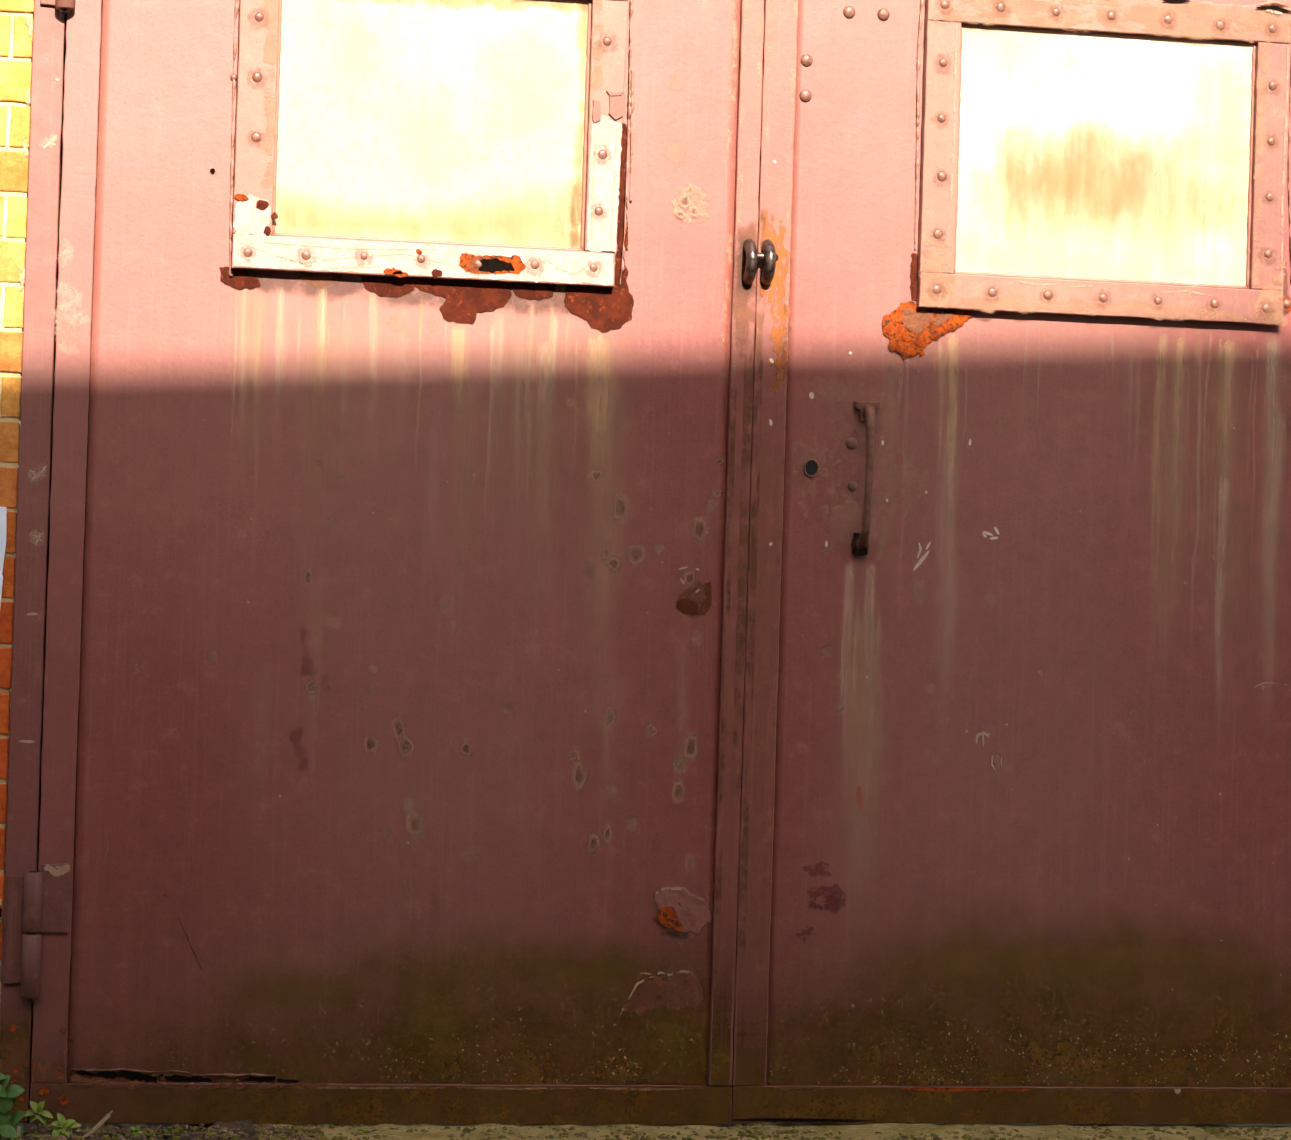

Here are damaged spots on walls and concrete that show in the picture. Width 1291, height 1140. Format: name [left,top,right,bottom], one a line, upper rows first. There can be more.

peeling [209,0,634,286]
corrosion [234,194,278,236]
corrosion [361,123,634,333]
corrosion [220,266,260,290]
corrosion [301,272,341,288]
corrosion [882,253,973,360]
corrosion [721,209,792,736]
corrosion [677,584,706,616]
peeling [654,886,711,934]
peeling [620,970,705,1015]